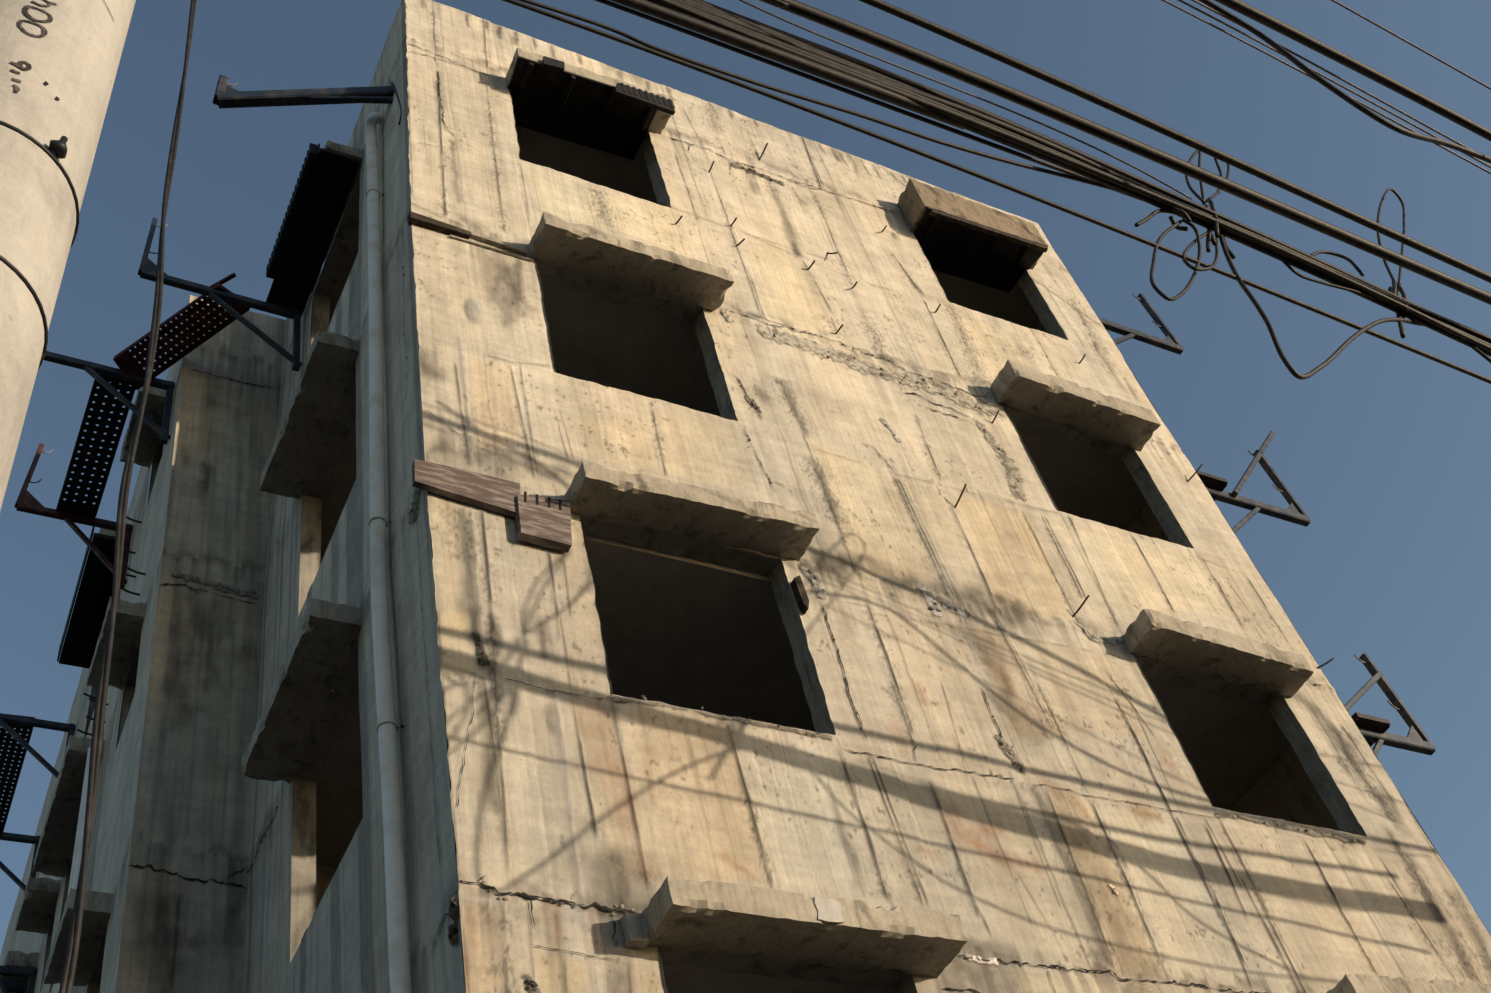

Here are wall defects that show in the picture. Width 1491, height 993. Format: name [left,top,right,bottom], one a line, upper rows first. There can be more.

spalling [757,324,1027,501]
crack [161,583,257,604]
crack [416,522,637,960]
crack [129,802,278,889]
spalling [523,975,541,993]